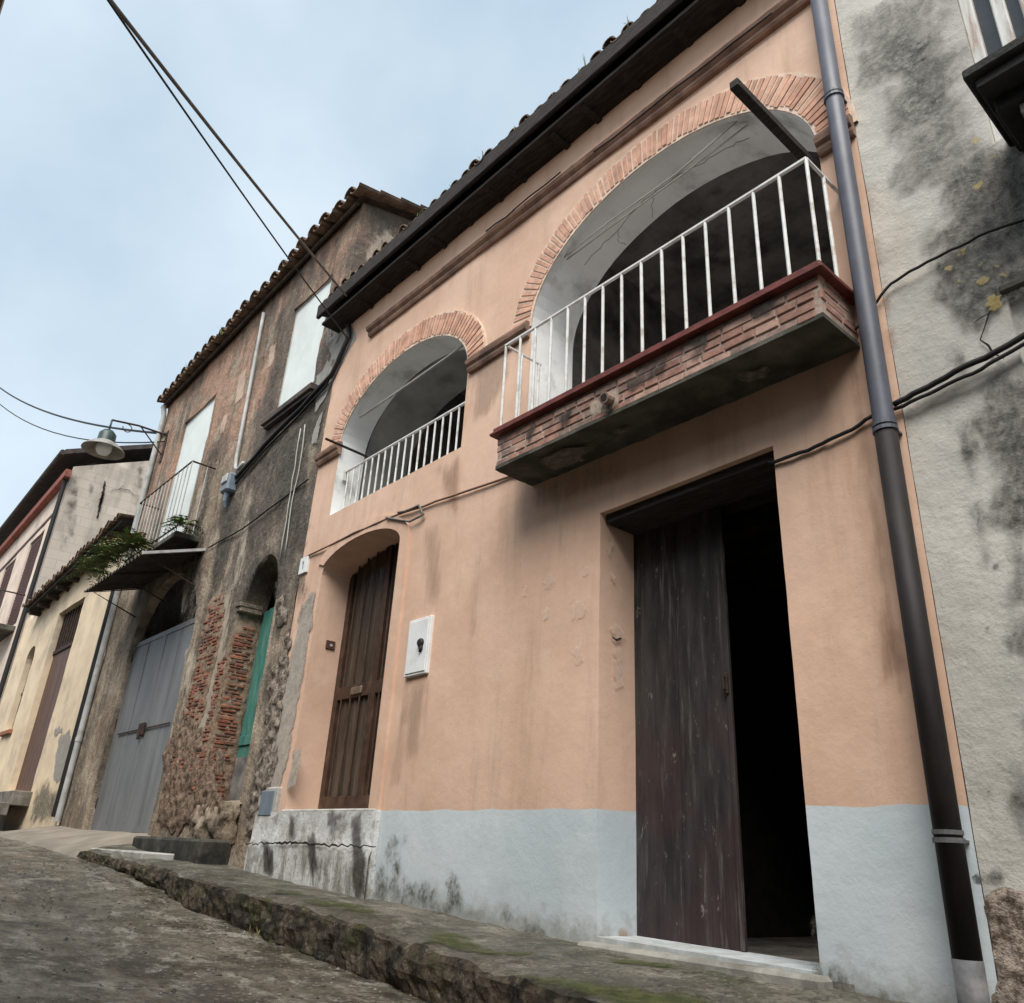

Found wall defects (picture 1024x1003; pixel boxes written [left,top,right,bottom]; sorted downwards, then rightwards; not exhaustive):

water stain [853,0,1024,328]
water stain [367,232,393,260]
crack [96,481,134,519]
water stain [961,373,1024,534]
water stain [182,393,329,735]
flaking render [156,590,316,837]
water stain [262,841,273,874]
crack [245,841,376,876]
water stain [307,833,317,870]
water stain [327,811,434,907]